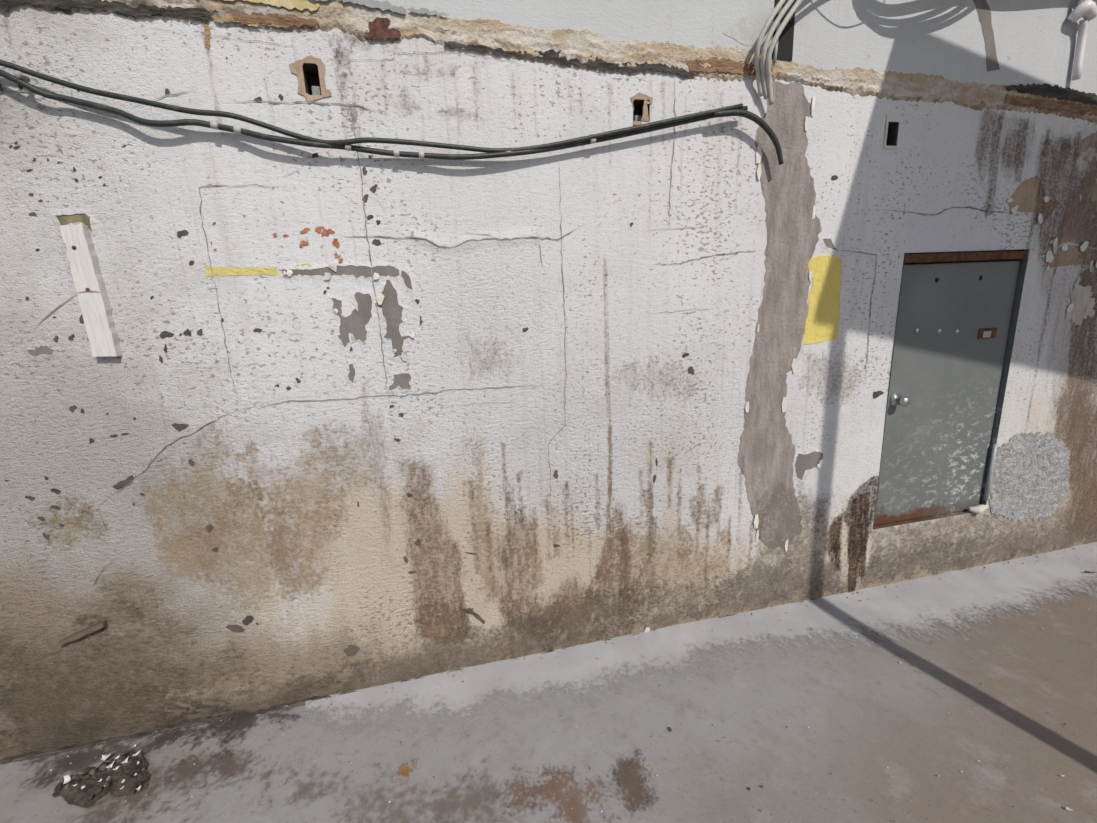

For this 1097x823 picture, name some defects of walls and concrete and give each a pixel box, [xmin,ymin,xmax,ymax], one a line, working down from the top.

spalling [0,0,1097,327]
peeling [159,329,202,363]
crack [98,100,584,529]
spalling [273,258,422,418]
damp [147,430,366,604]
damp [343,462,846,693]
damp [862,476,1097,584]
damp [21,709,299,788]